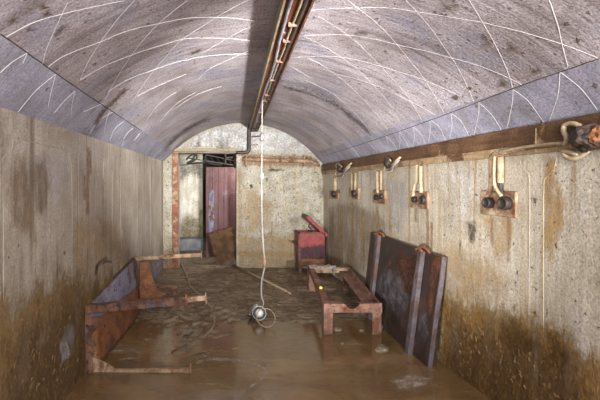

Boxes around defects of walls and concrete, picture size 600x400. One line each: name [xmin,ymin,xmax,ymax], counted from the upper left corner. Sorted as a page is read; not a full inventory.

damp [0,258,120,400]
damp [434,291,600,400]